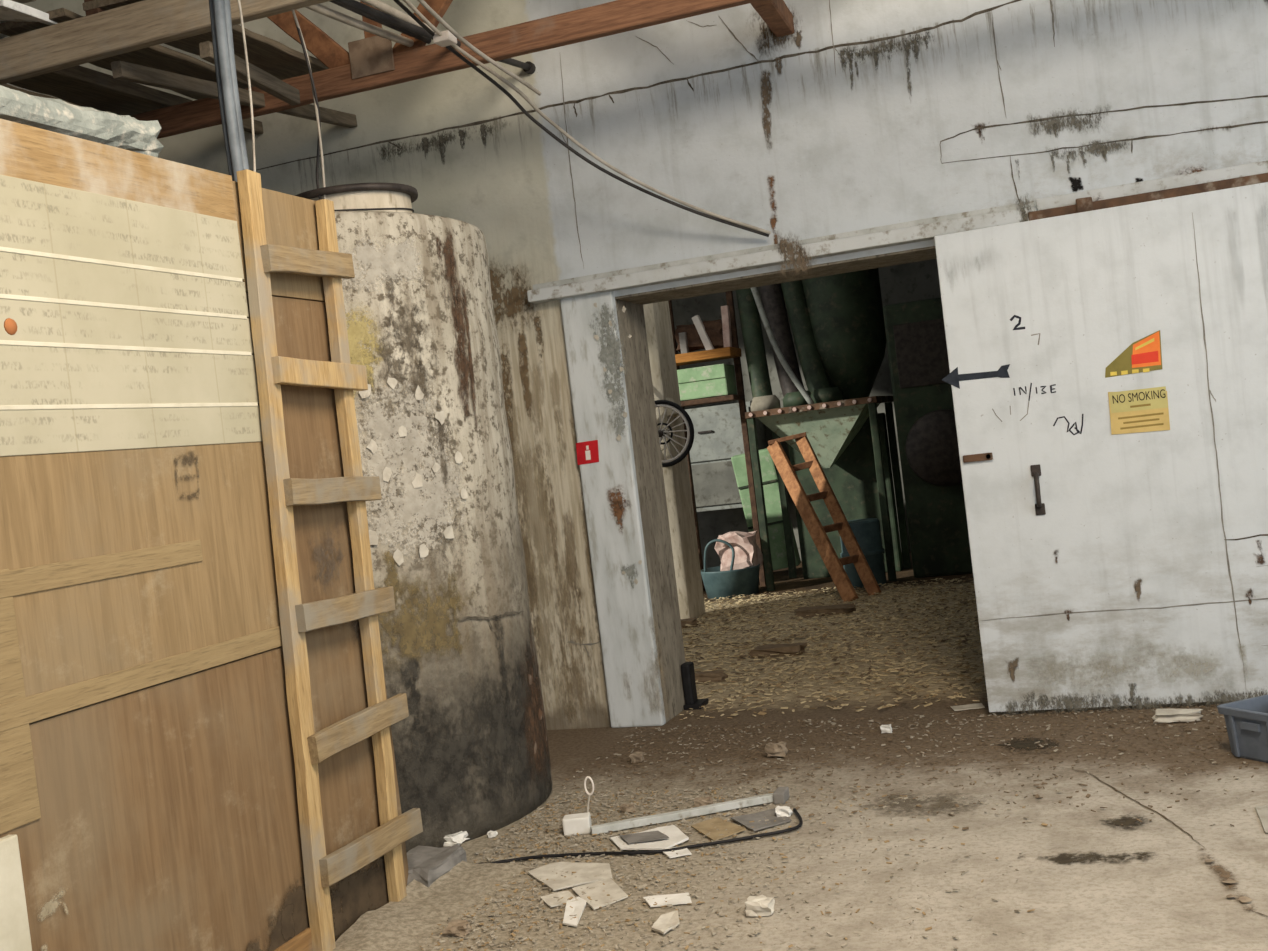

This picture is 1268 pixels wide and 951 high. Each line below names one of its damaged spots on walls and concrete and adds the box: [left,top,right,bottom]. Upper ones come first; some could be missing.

leakage [839,33,931,96]
leakage [379,124,504,164]
leakage [1030,109,1126,173]
rust [768,176,778,244]
rust [437,233,477,427]
leakage [489,268,542,456]
rust [608,489,629,528]
leakage [375,551,552,825]
crack [1057,766,1205,848]